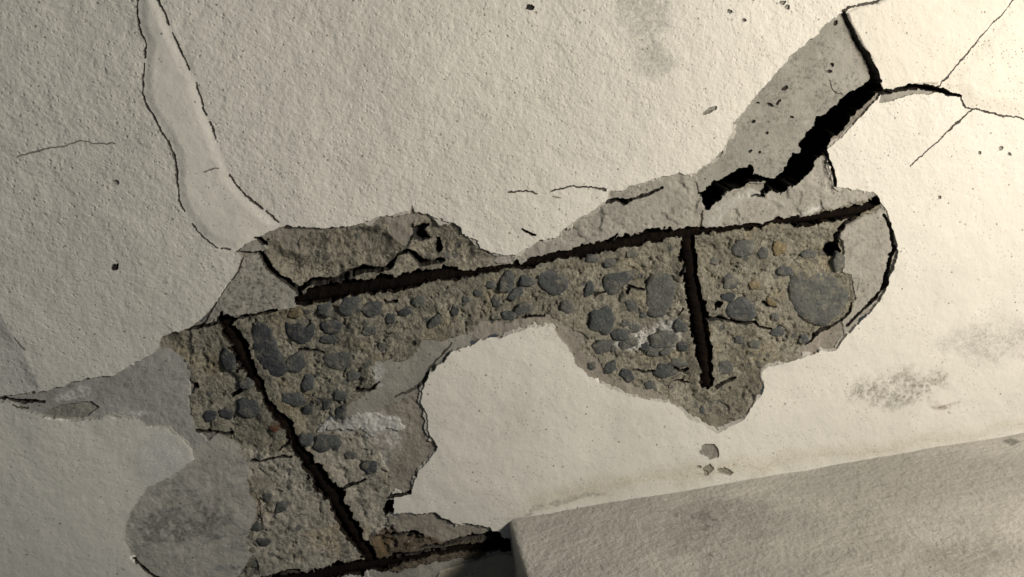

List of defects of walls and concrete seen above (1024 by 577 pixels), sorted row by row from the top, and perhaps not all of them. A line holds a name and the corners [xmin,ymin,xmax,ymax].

crack [814,0,1024,167]
spalling [827,88,935,148]
crack [136,0,446,331]
peeling [261,14,870,286]
crack [508,185,664,206]
crack [820,149,837,187]
crack [804,213,897,345]
crack [702,311,773,330]
crack [394,342,452,398]
spalling [0,155,899,577]
crack [386,490,412,499]
crack [132,557,160,577]